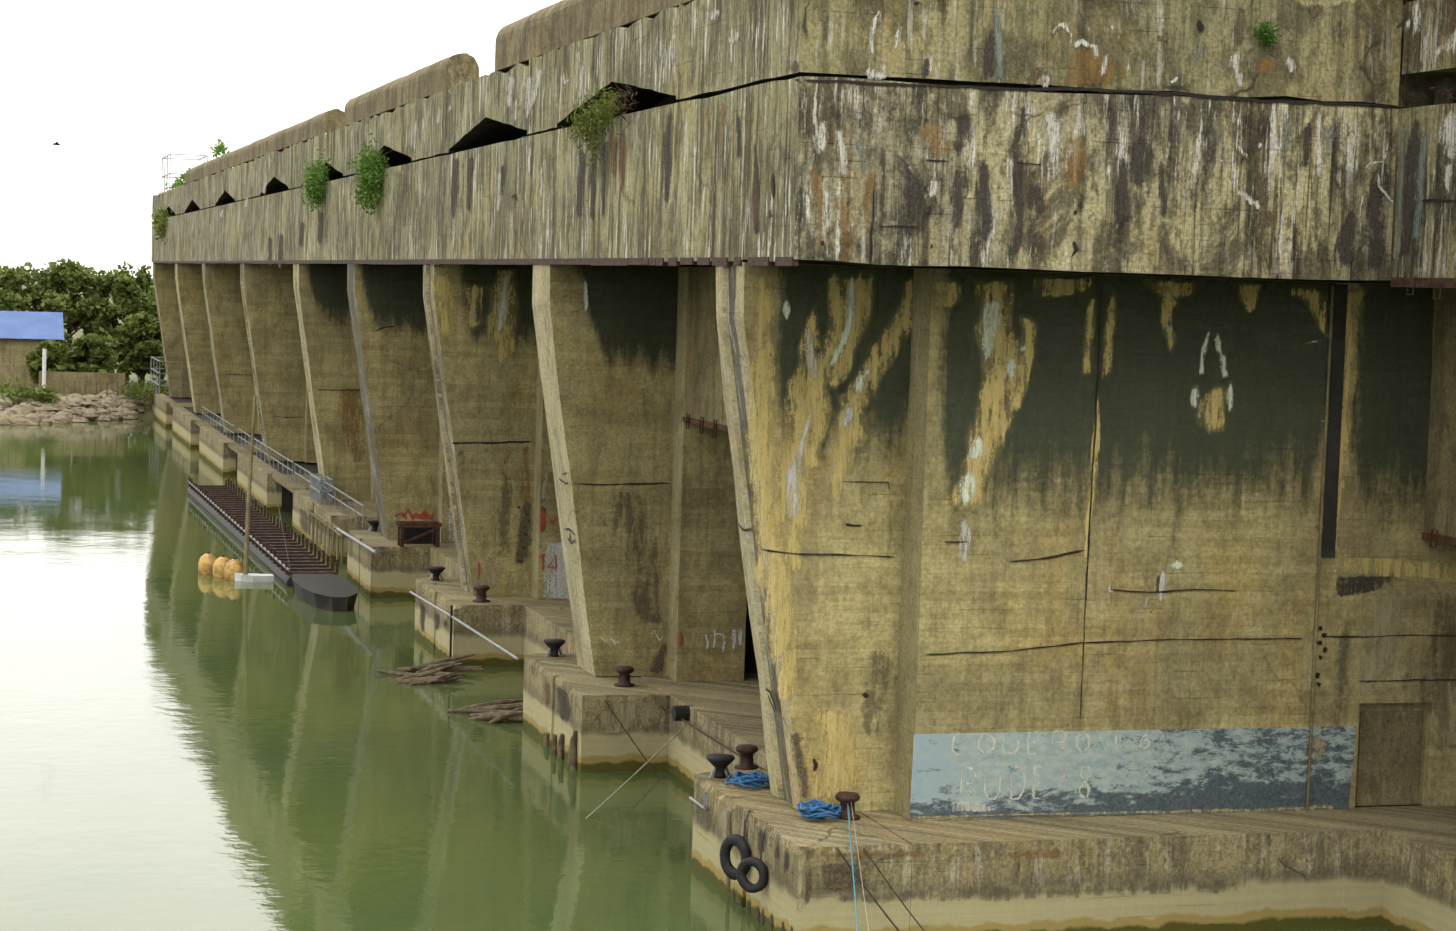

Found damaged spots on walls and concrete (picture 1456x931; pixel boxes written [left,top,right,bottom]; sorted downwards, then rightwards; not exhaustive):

water stain [904,113,994,240]
water stain [1406,1,1421,32]
water stain [746,264,914,700]
water stain [937,106,1456,709]